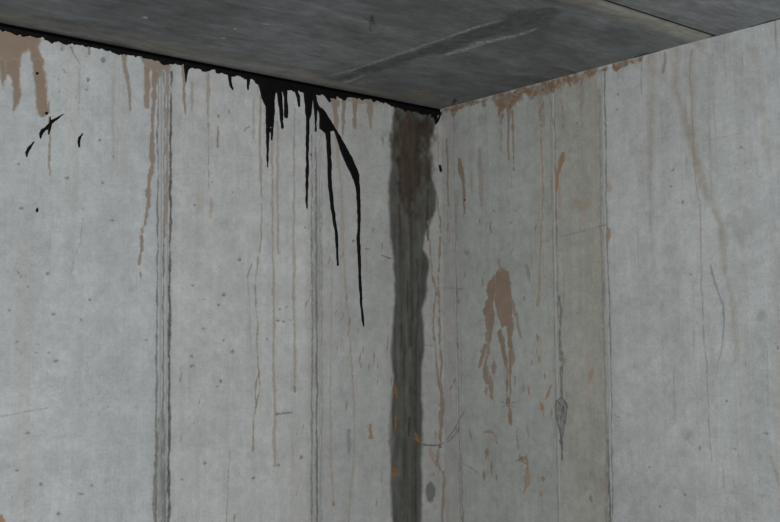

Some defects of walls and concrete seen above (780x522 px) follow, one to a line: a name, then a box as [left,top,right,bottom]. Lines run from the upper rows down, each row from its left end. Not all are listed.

leakage [0,8,559,522]
corrosion [441,56,643,171]